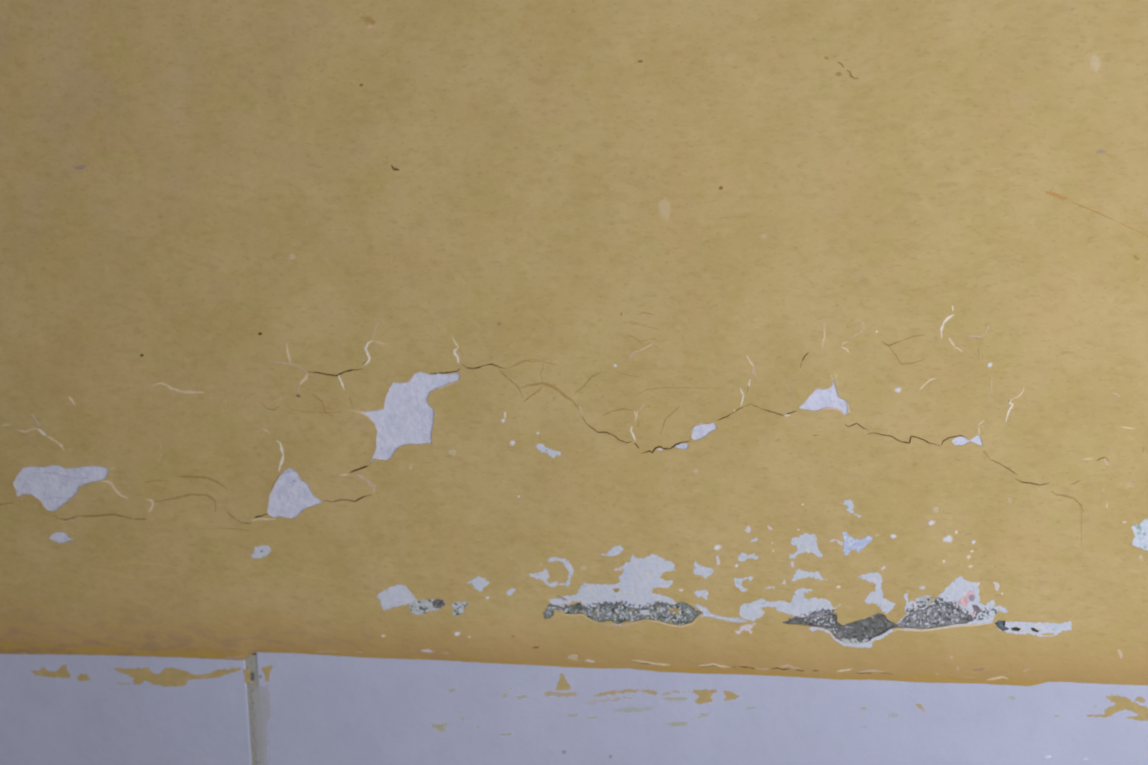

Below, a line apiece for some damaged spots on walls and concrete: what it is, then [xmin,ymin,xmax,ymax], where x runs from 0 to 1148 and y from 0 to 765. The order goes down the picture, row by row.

crack [800,306,988,390]
crack [262,321,386,472]
peeling [350,369,460,473]
crack [451,336,795,453]
peeling [785,374,850,416]
crack [1006,388,1024,421]
peeling [13,465,128,511]
crack [64,476,266,520]
peeling [251,468,322,521]
crack [850,423,1109,513]
peeling [376,584,469,616]
flaking render [529,526,1072,648]